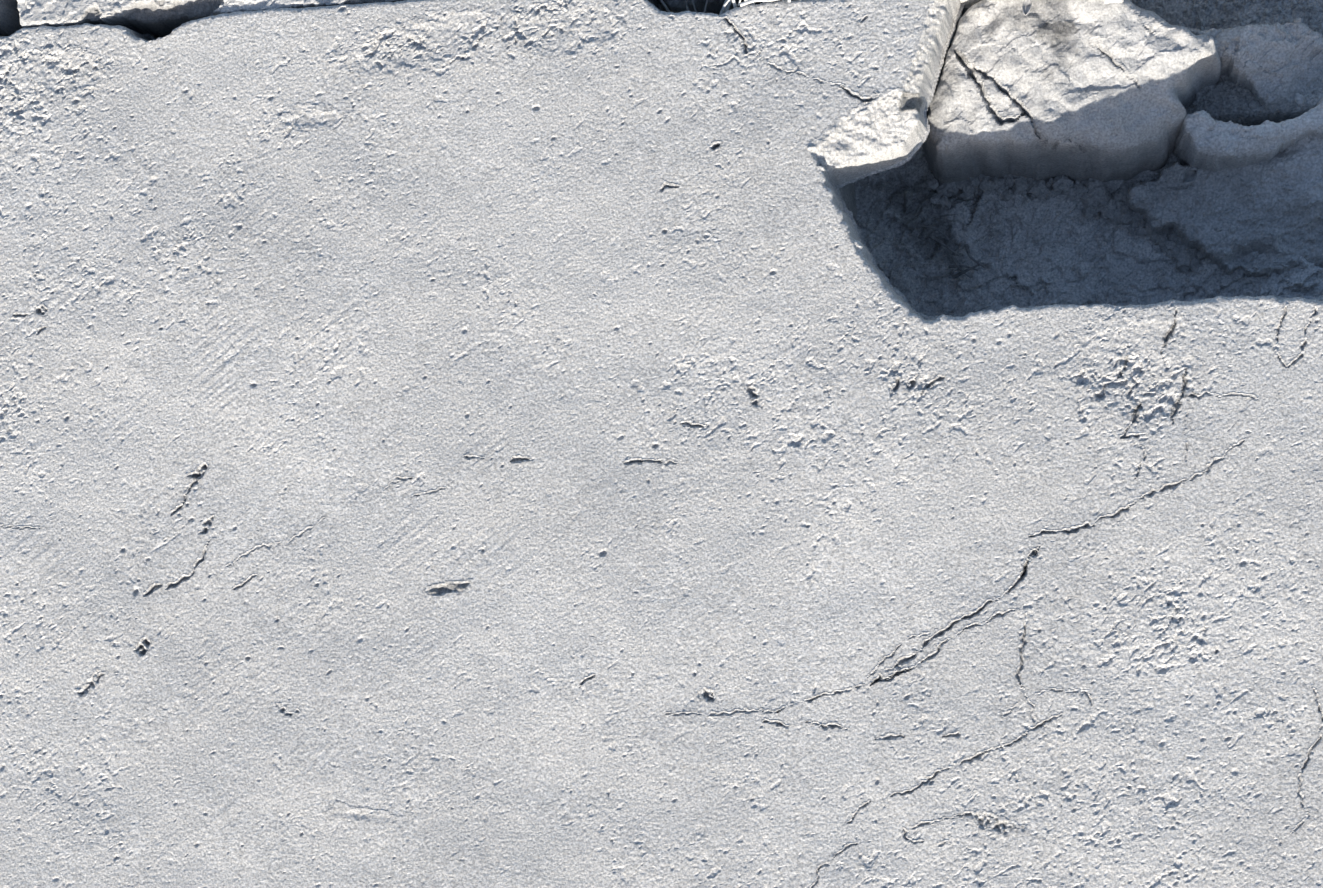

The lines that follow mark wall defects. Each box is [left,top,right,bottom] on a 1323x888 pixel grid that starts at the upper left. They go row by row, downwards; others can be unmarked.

peeling [805,0,958,182]
peeling [847,229,873,274]
crack [1273,304,1319,370]
crack [665,391,1259,888]